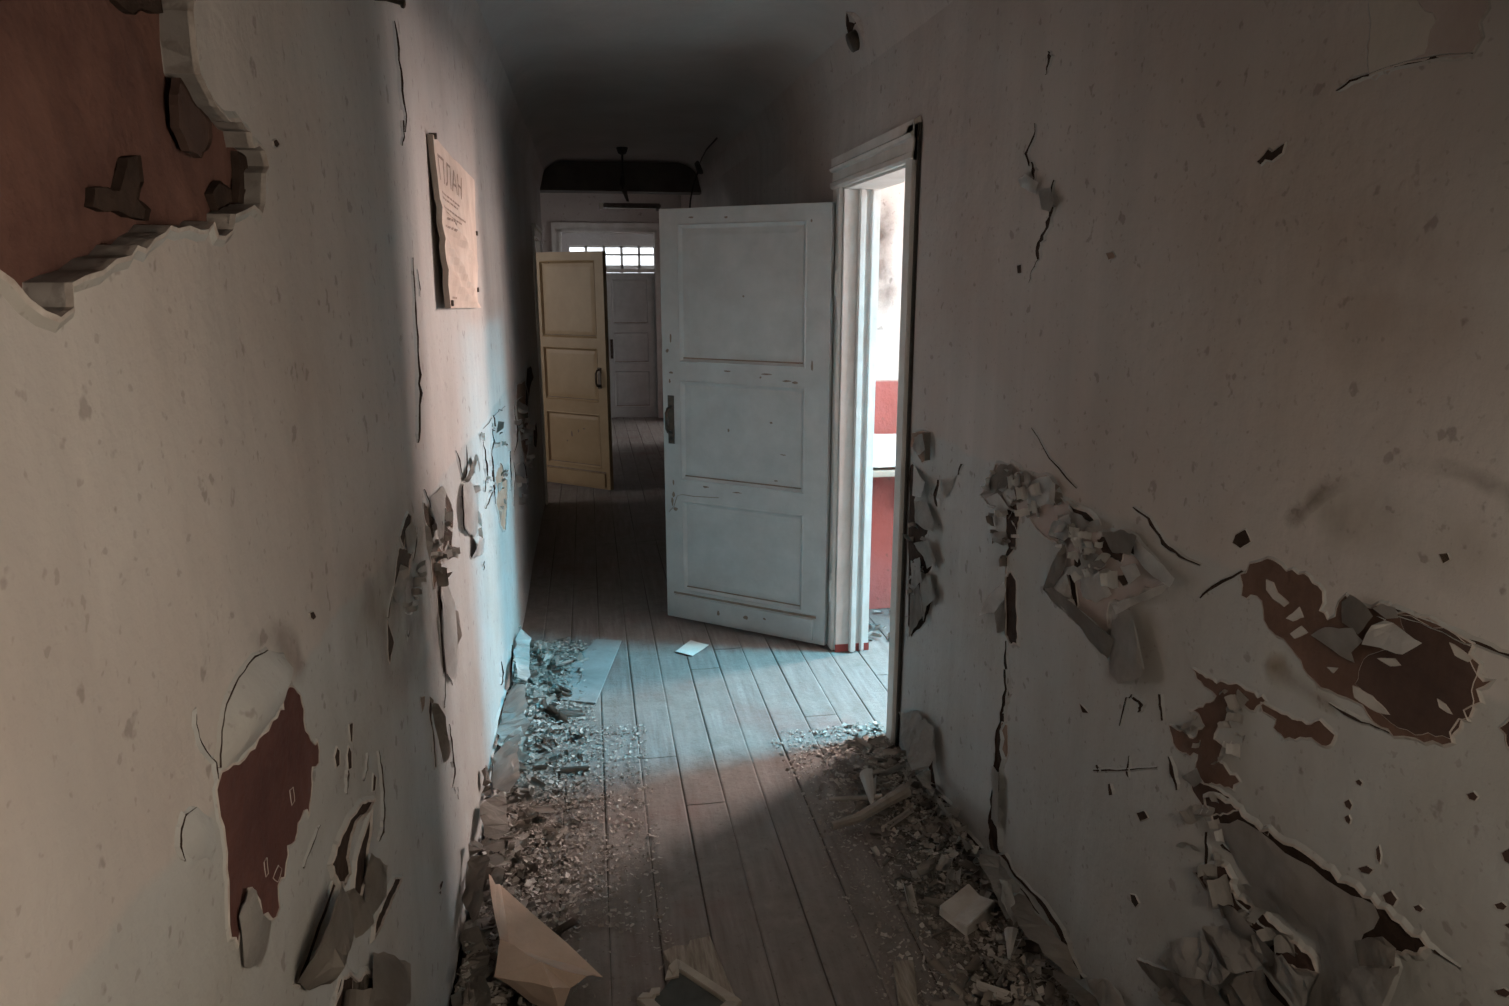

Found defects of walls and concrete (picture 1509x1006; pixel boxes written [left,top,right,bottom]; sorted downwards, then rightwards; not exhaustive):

spalling [0,0,280,333]
peeling [386,366,538,770]
peeling [902,430,964,639]
peeling [979,460,1175,726]
peeling [212,683,411,1006]
peeling [1136,528,1509,1006]